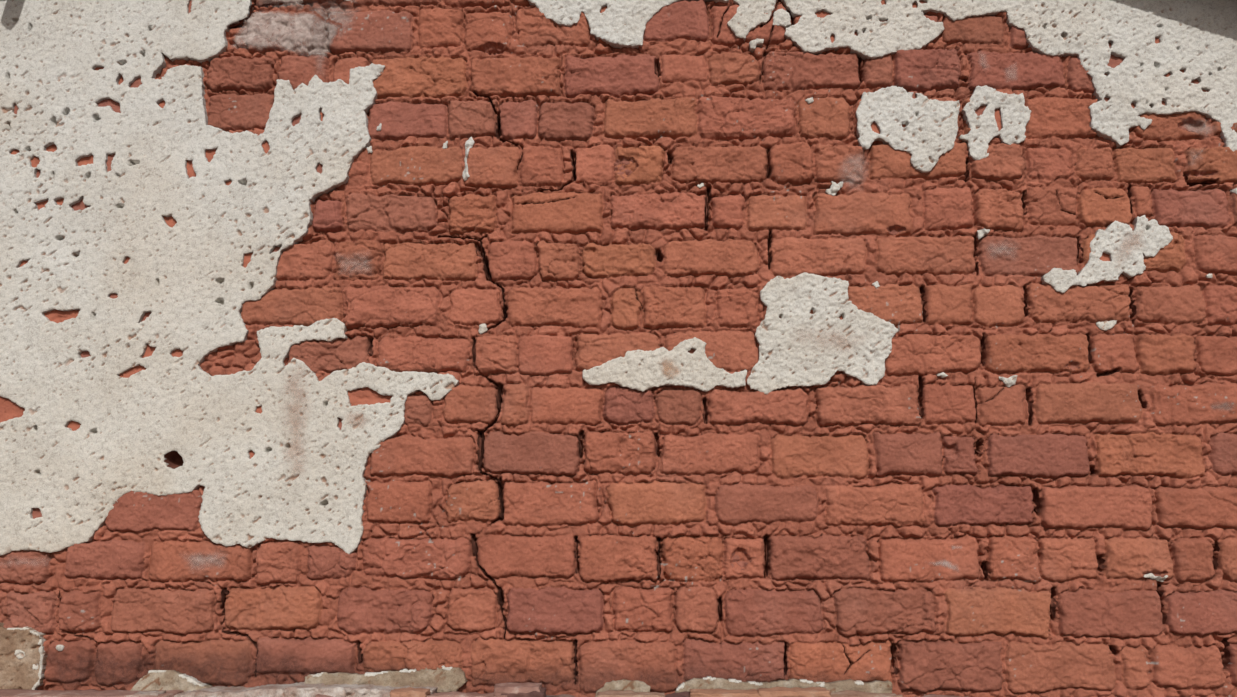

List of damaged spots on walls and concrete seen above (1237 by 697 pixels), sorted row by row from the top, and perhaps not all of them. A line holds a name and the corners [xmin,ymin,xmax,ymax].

spalling [478,42,505,55]
crack [760,0,794,80]
flaking render [528,0,1237,154]
flaking render [855,85,1031,173]
flaking render [825,181,843,196]
flaking render [0,0,459,556]
flaking render [1041,215,1173,294]
flaking render [583,272,898,394]
flaking render [1096,320,1117,331]
flaking render [999,375,1017,387]
flaking render [1142,571,1168,582]